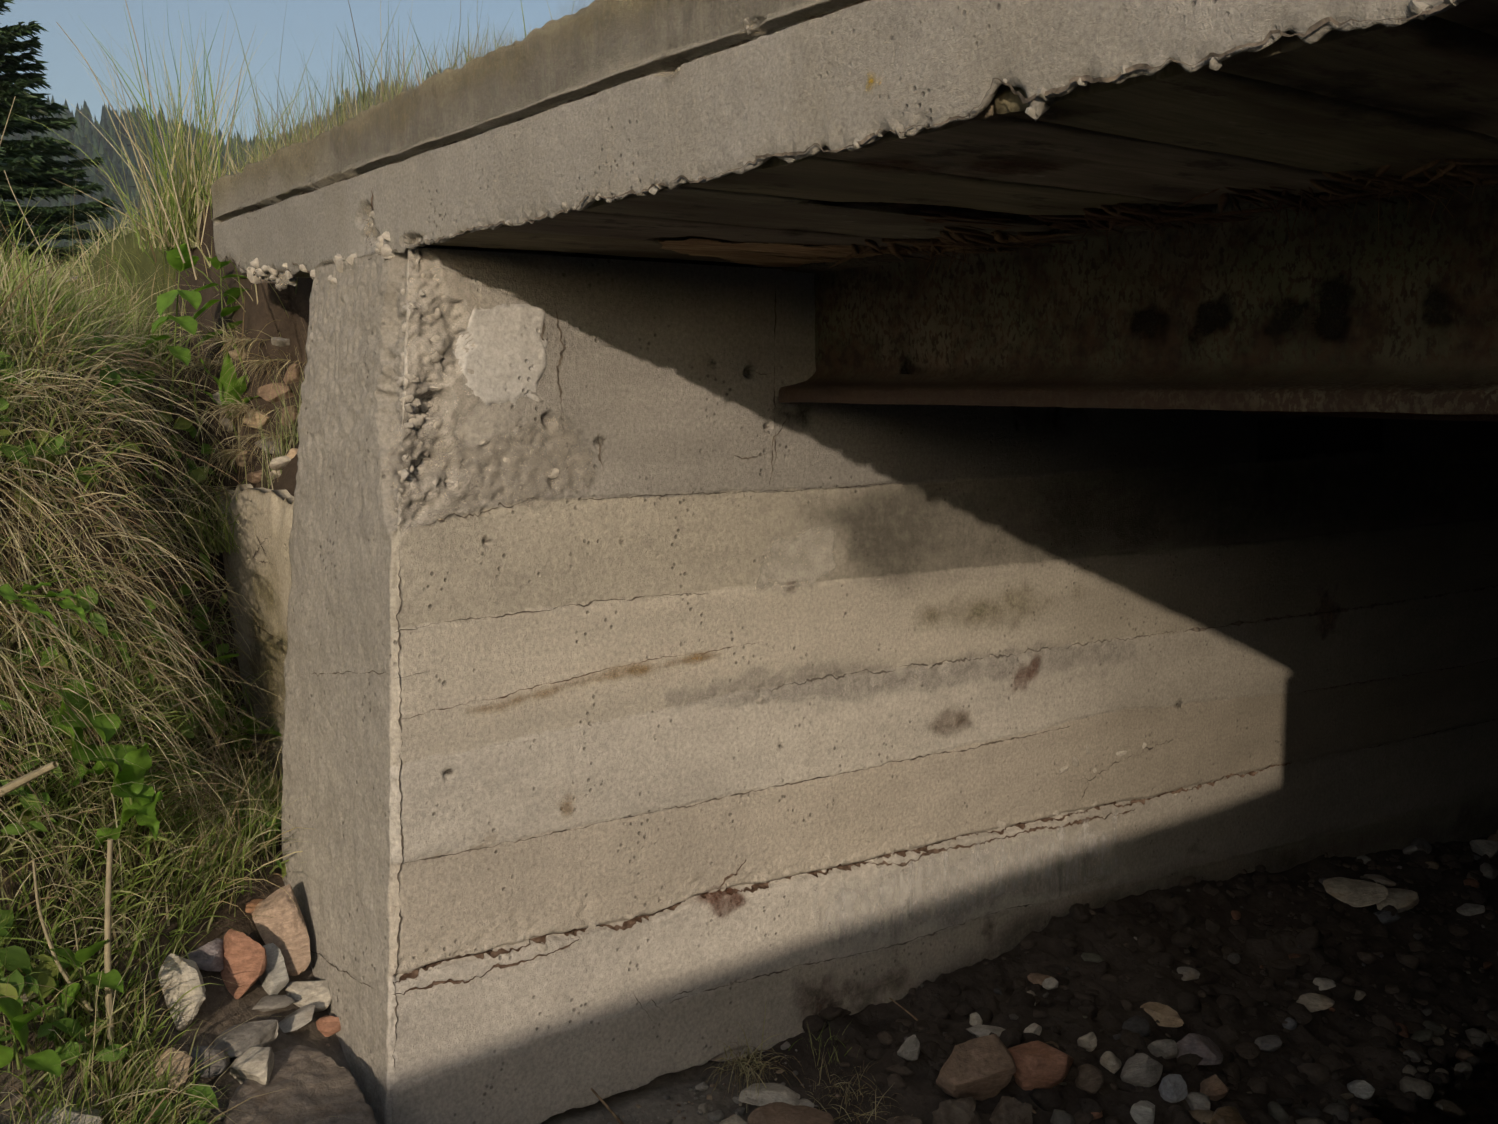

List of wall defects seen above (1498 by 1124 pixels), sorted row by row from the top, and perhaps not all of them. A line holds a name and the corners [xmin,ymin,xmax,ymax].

spalling [219,0,1459,530]
crack [253,534,270,564]
crack [302,289,1291,1067]